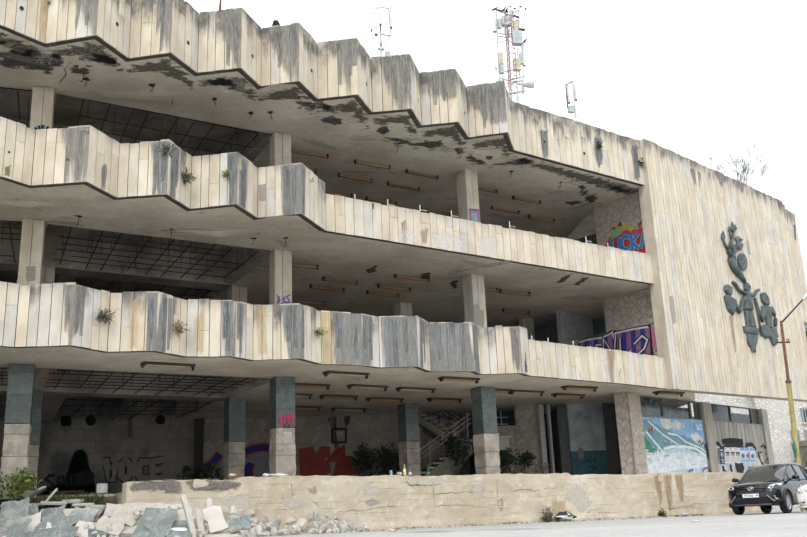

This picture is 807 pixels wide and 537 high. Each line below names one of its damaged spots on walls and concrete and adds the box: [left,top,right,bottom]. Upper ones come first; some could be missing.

water stain [75,0,99,35]
water stain [63,126,90,182]
water stain [152,141,179,198]
water stain [228,153,248,208]
water stain [540,130,548,158]
water stain [594,138,603,168]
water stain [632,147,640,181]
water stain [280,304,305,359]
water stain [321,312,480,373]
water stain [510,327,522,372]
crack [407,482,564,511]